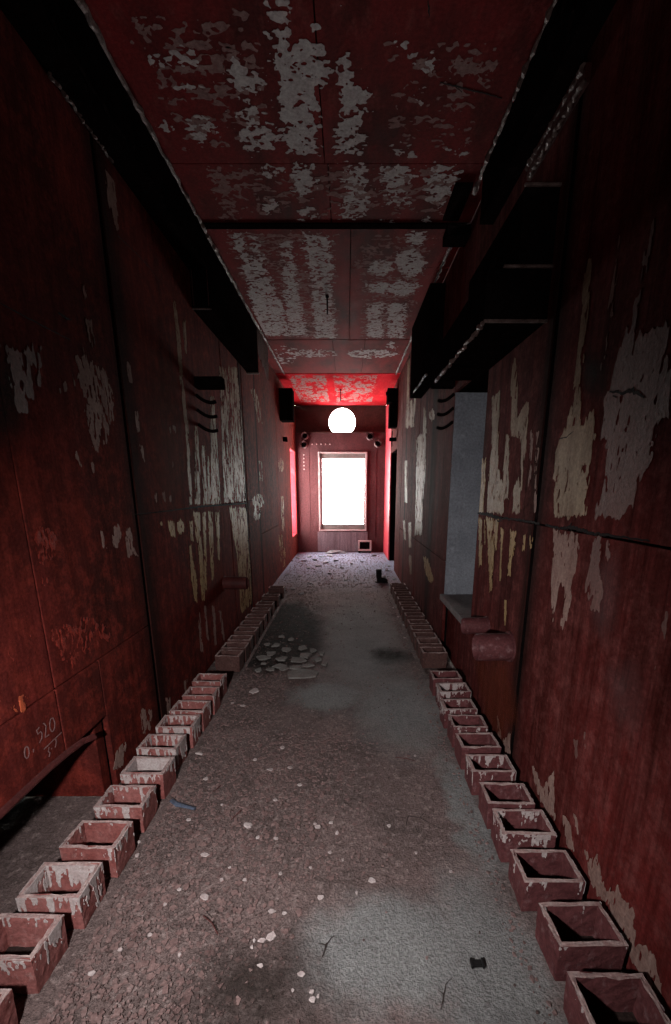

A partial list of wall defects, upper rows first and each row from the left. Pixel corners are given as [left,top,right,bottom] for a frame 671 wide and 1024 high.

peeling [0,343,42,414]
peeling [59,319,114,473]
peeling [160,301,264,652]
peeling [130,0,498,583]
peeling [478,357,539,592]
peeling [551,219,671,630]
peeling [532,766,662,996]